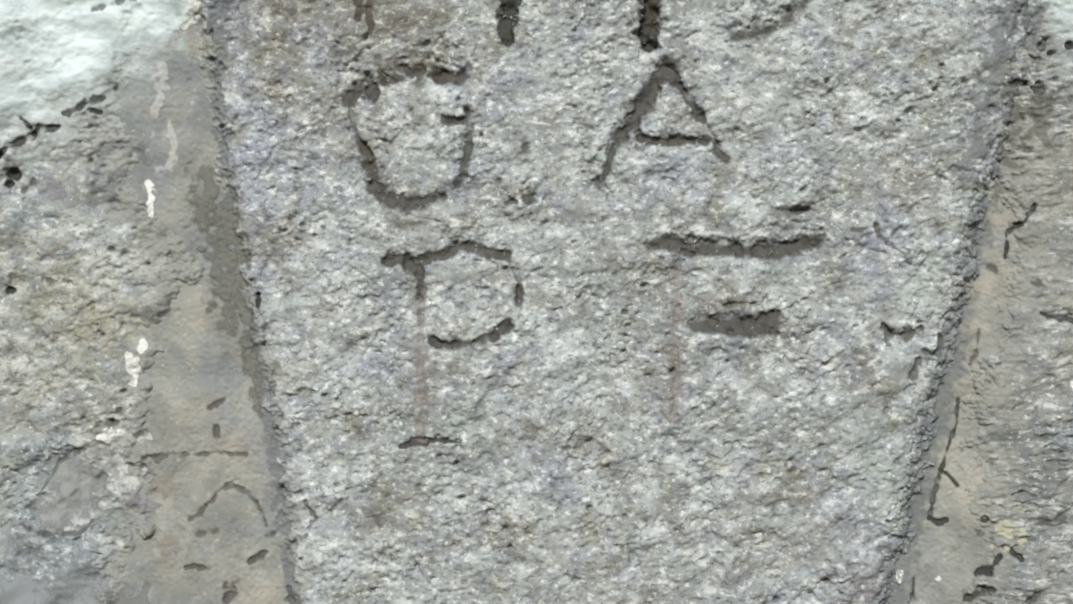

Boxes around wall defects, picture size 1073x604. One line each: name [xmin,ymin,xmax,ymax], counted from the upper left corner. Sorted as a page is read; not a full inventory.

crack [927,398,959,526]